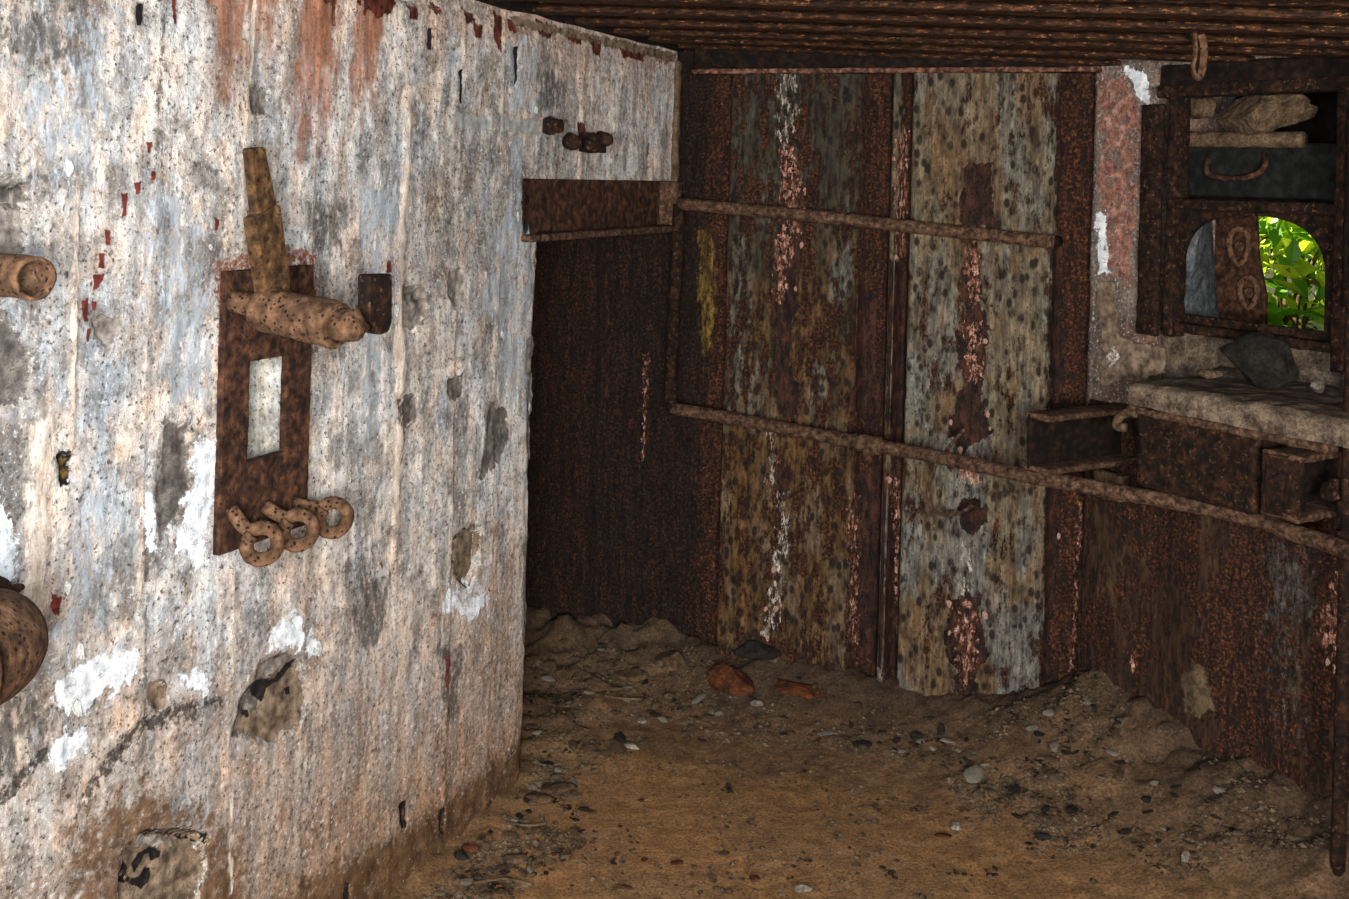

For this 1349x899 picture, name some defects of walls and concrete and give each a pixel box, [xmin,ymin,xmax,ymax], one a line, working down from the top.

peeling [0,0,146,254]
rust [207,0,277,99]
rust [295,0,441,162]
peeling [1094,65,1167,387]
peeling [0,487,27,581]
spalling [0,297,38,413]
peeling [43,167,222,772]
rust [943,162,997,696]
spalling [232,608,322,749]
rust [1316,572,1338,673]